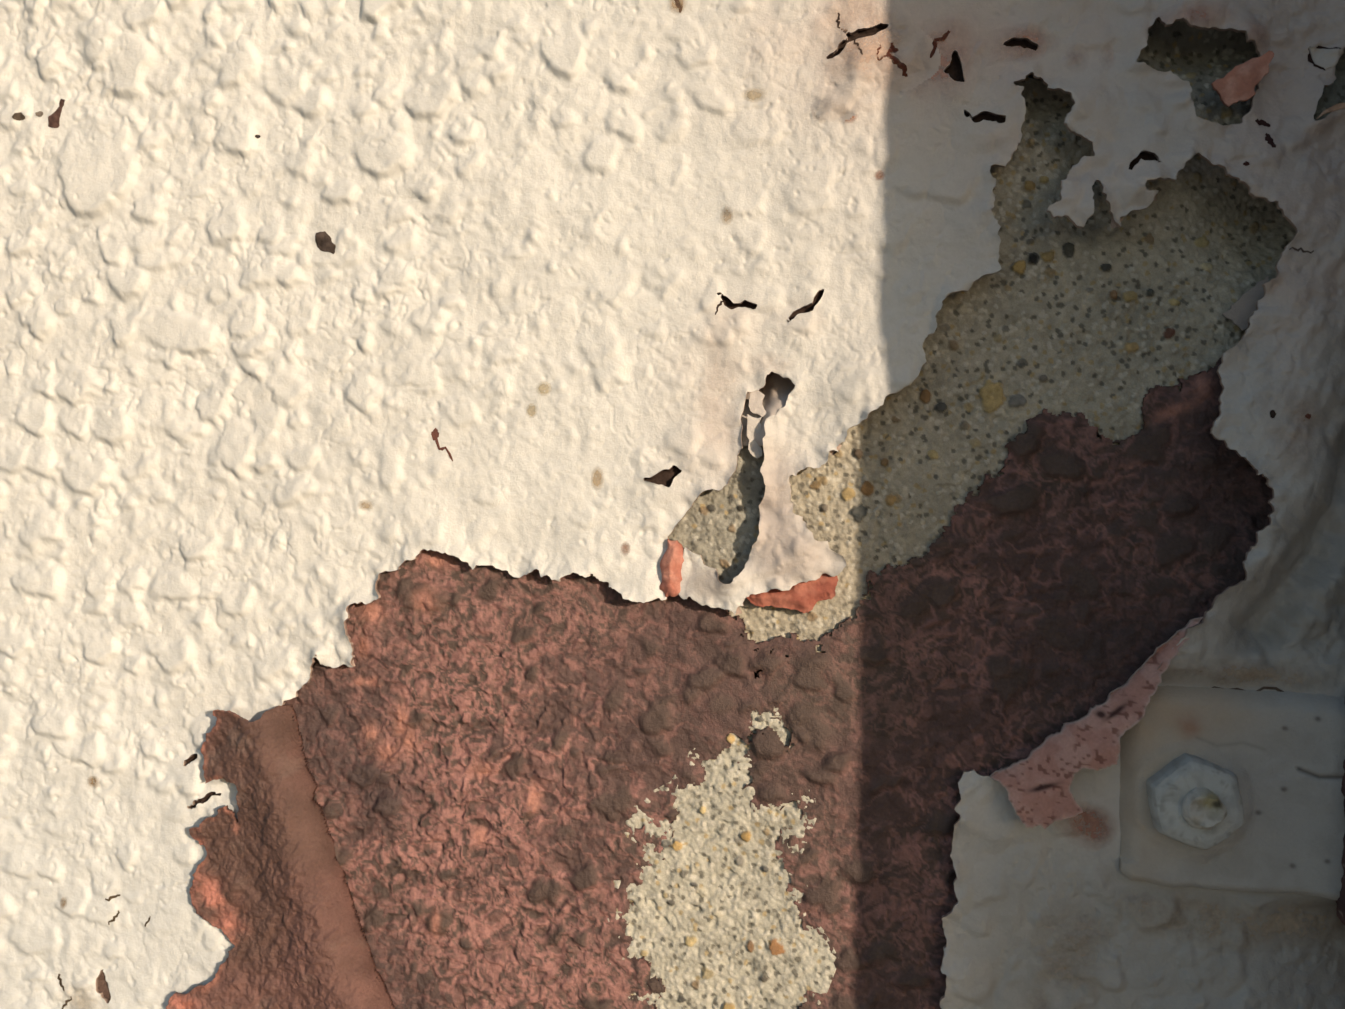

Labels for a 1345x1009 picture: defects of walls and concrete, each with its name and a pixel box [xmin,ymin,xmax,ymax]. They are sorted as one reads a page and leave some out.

peeling [1137,19,1274,126]
peeling [1309,47,1345,121]
peeling [166,77,1296,1009]